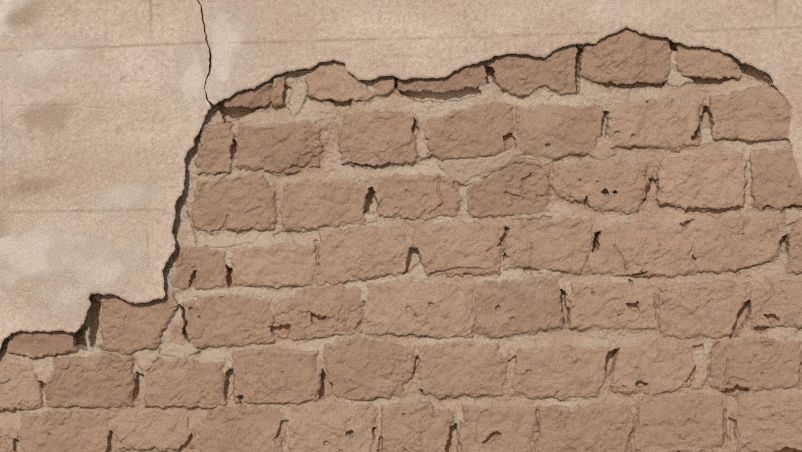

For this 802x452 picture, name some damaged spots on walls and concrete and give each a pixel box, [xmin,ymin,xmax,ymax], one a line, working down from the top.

crack [197,0,213,107]
spalling [394,27,679,104]
spalling [39,42,802,410]
spalling [0,297,106,411]
spalling [131,178,802,452]
spalling [0,389,207,452]